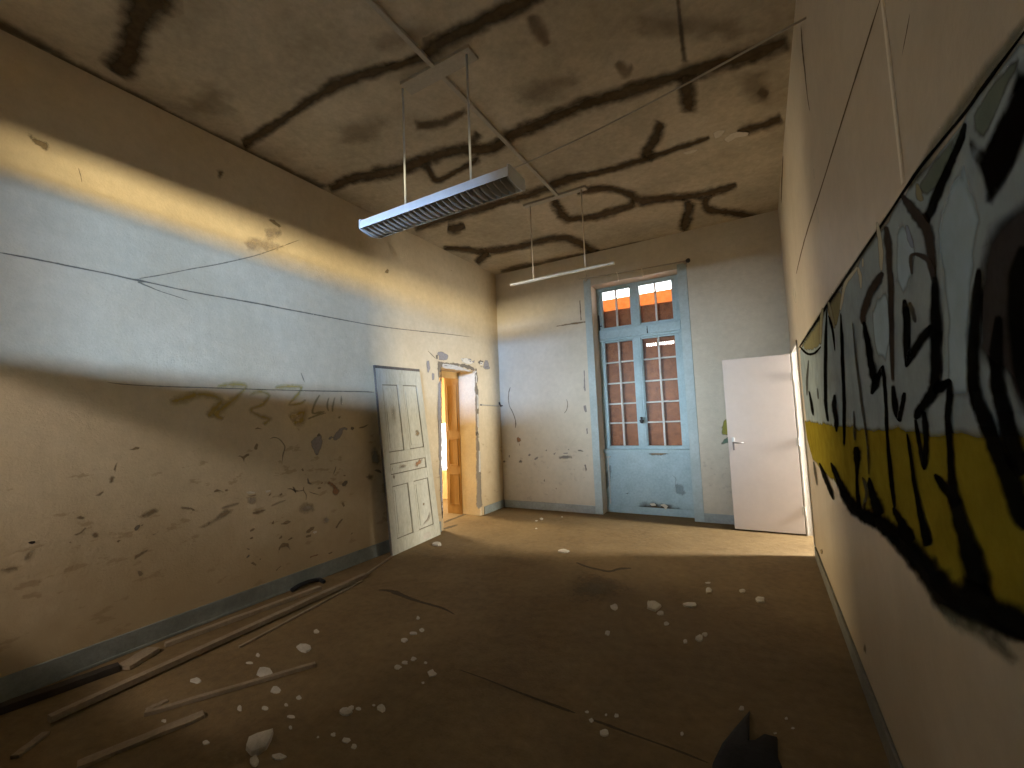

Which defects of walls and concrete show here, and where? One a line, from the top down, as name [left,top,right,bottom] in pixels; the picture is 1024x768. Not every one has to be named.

leakage [0,0,789,191]
leakage [415,121,757,272]
crack [796,0,880,273]
crack [3,240,468,337]
spalling [427,351,490,518]